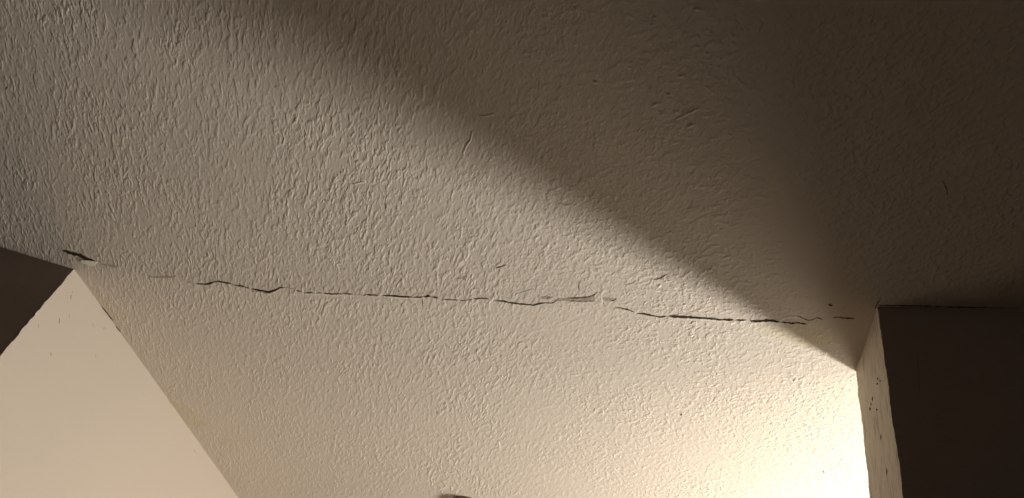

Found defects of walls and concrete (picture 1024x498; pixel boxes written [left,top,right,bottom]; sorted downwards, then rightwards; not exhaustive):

crack [63,250,119,268]
crack [147,247,998,325]